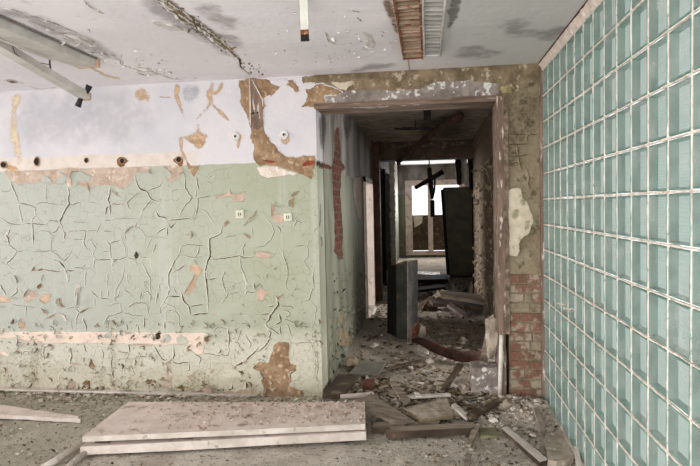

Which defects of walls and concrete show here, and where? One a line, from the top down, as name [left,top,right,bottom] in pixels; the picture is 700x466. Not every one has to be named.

crack [154,0,251,75]
peeling [4,166,153,198]
peeling [163,158,201,183]
spalling [237,63,539,261]
peeling [0,265,212,355]
crack [0,174,322,393]
spalling [163,340,306,397]